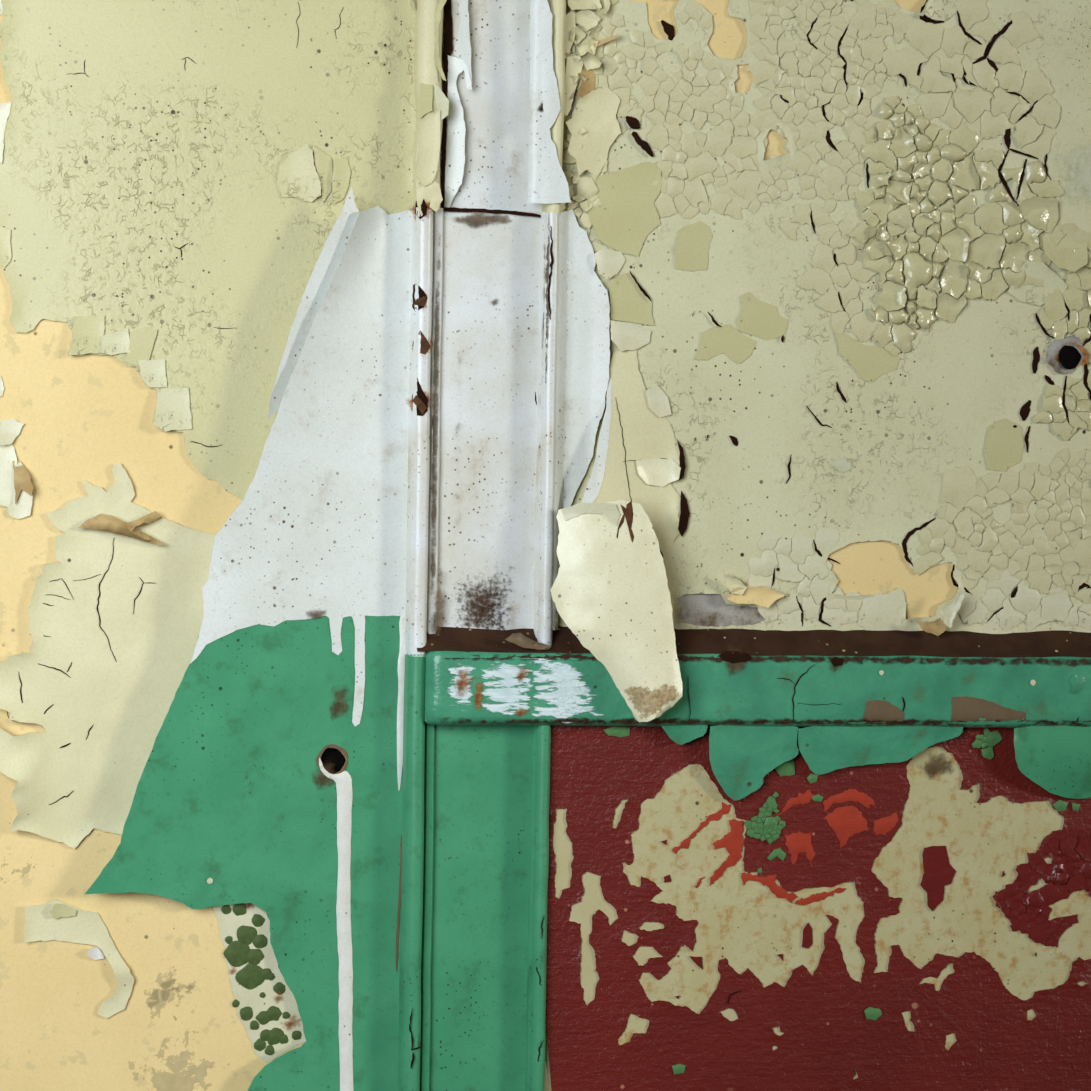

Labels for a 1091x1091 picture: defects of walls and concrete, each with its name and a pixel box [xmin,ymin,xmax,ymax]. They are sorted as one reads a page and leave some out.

crack [661,20,674,41]
crack [806,18,864,151]
crack [920,0,1051,206]
crack [626,116,654,157]
crack [630,271,651,301]
crack [1013,303,1091,453]
peeling [527,0,1091,1021]
peeling [0,0,472,1091]
crack [902,517,936,566]
crack [771,568,831,627]
peeling [618,1013,649,1045]
peeling [901,1011,914,1031]